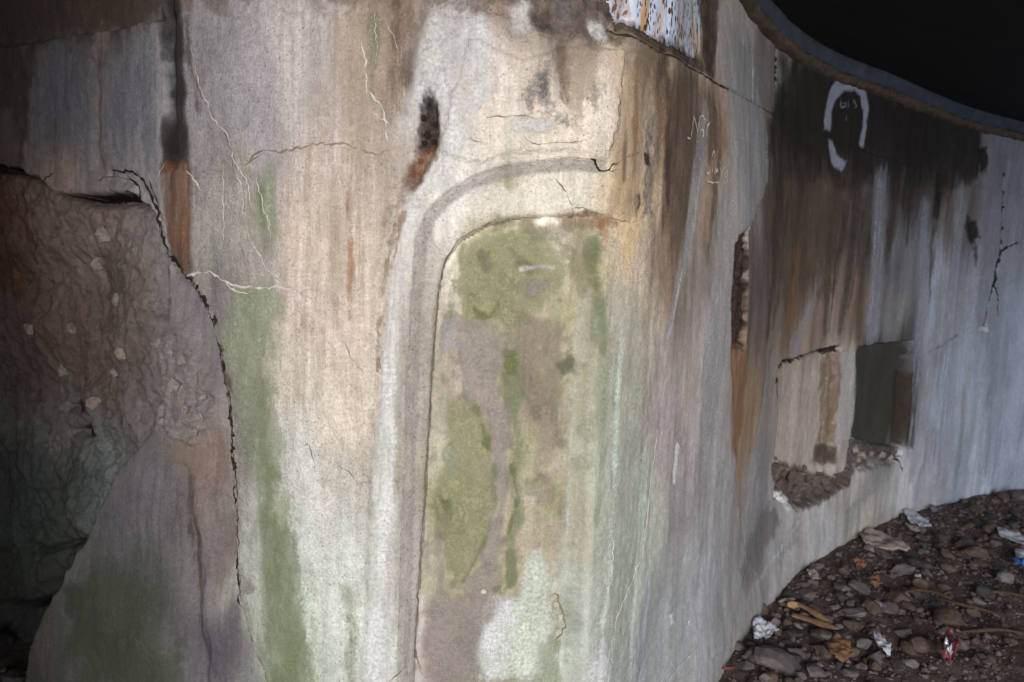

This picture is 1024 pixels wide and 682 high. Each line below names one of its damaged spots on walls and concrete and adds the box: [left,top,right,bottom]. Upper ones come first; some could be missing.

damp [161,0,198,168]
crack [471,30,917,172]
spalling [0,168,239,642]
rust [161,161,191,268]
crack [0,13,401,608]
crack [389,218,498,682]
rust [730,231,749,455]
damp [656,34,965,483]
rust [814,351,842,463]
spalling [771,351,897,513]
crack [984,172,1018,324]
damp [472,550,562,682]